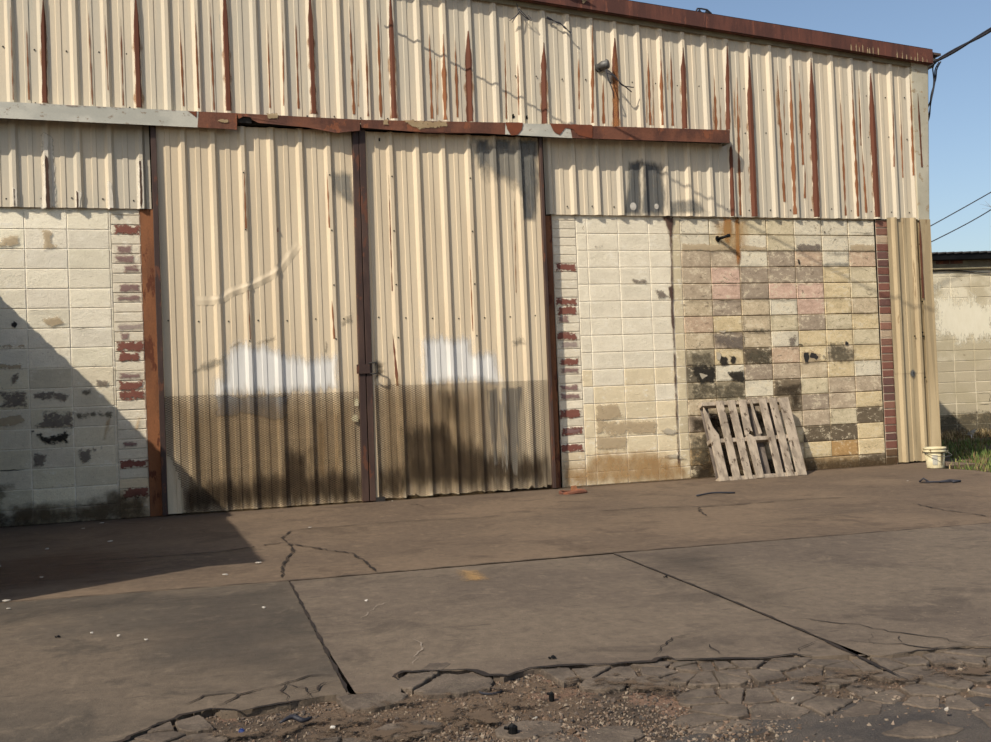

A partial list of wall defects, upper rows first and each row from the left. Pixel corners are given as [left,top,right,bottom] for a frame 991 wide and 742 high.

corrosion [121,0,144,108]
peeling [116,324,144,361]
peeling [119,373,145,401]
peeling [120,459,148,469]
damp [0,492,156,527]
peeling [123,487,149,498]